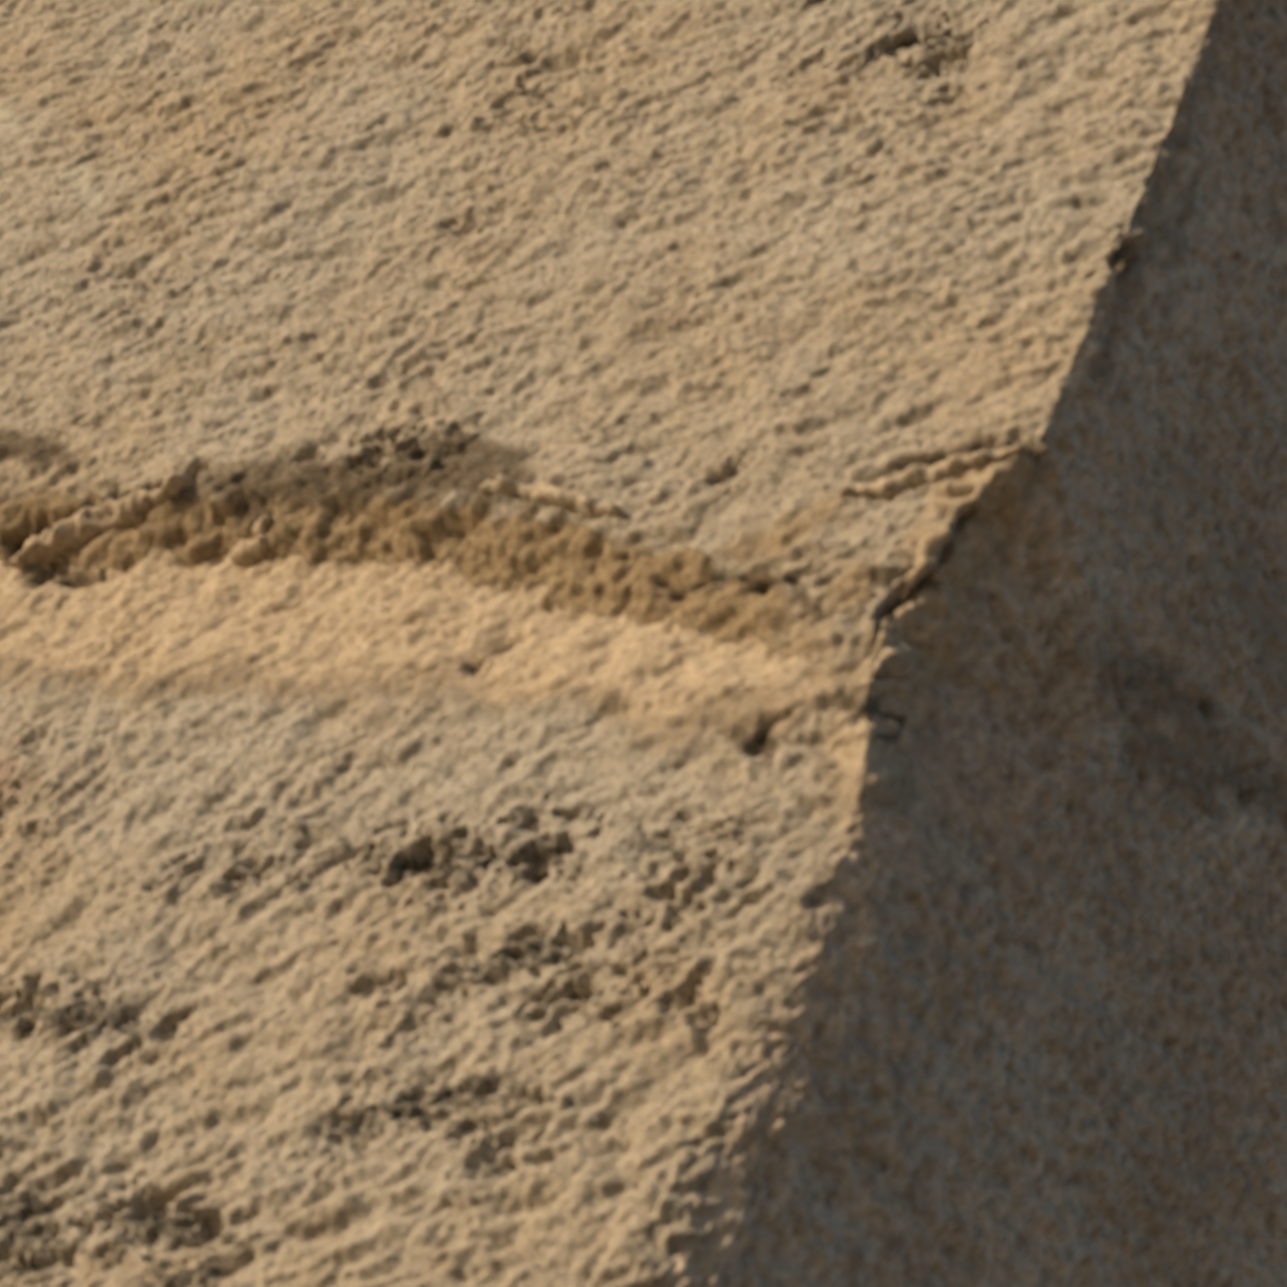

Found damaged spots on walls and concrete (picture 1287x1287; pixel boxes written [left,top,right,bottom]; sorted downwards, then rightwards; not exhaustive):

crack [0,546,99,589]
crack [668,573,823,616]
crack [869,513,973,656]